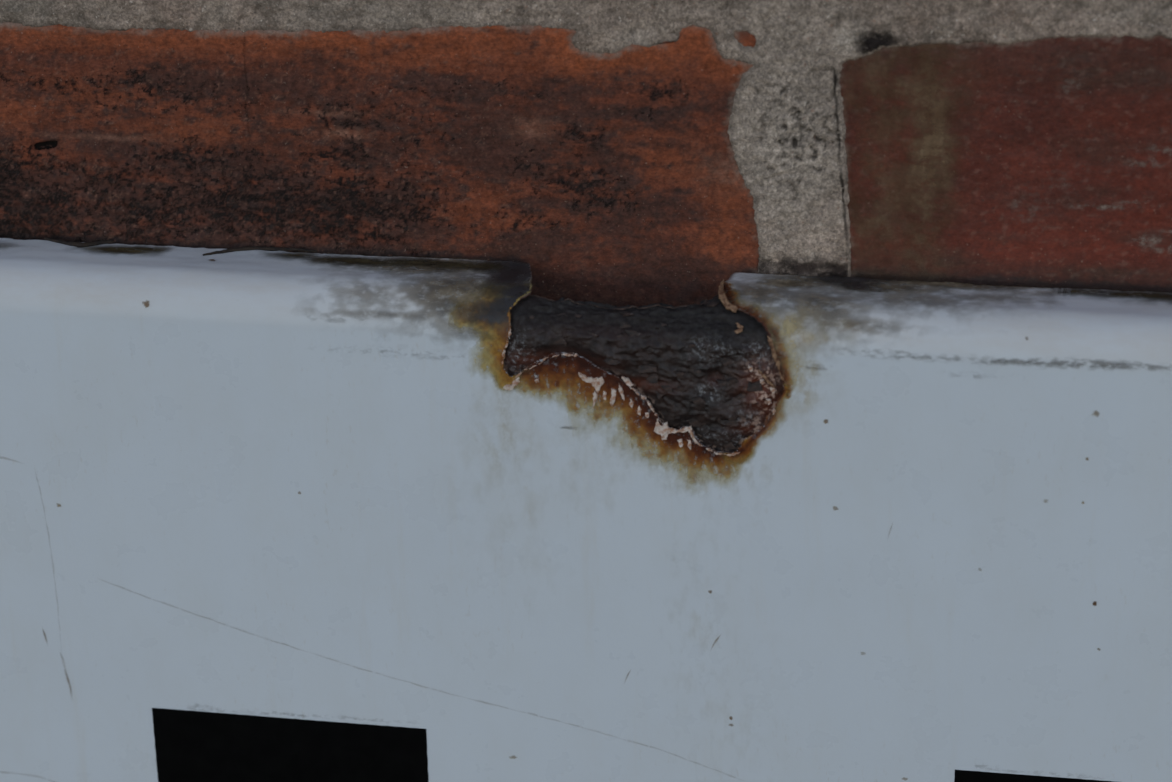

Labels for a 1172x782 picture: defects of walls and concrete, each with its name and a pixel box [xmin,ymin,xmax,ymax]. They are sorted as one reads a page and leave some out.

rust [450,279,793,482]